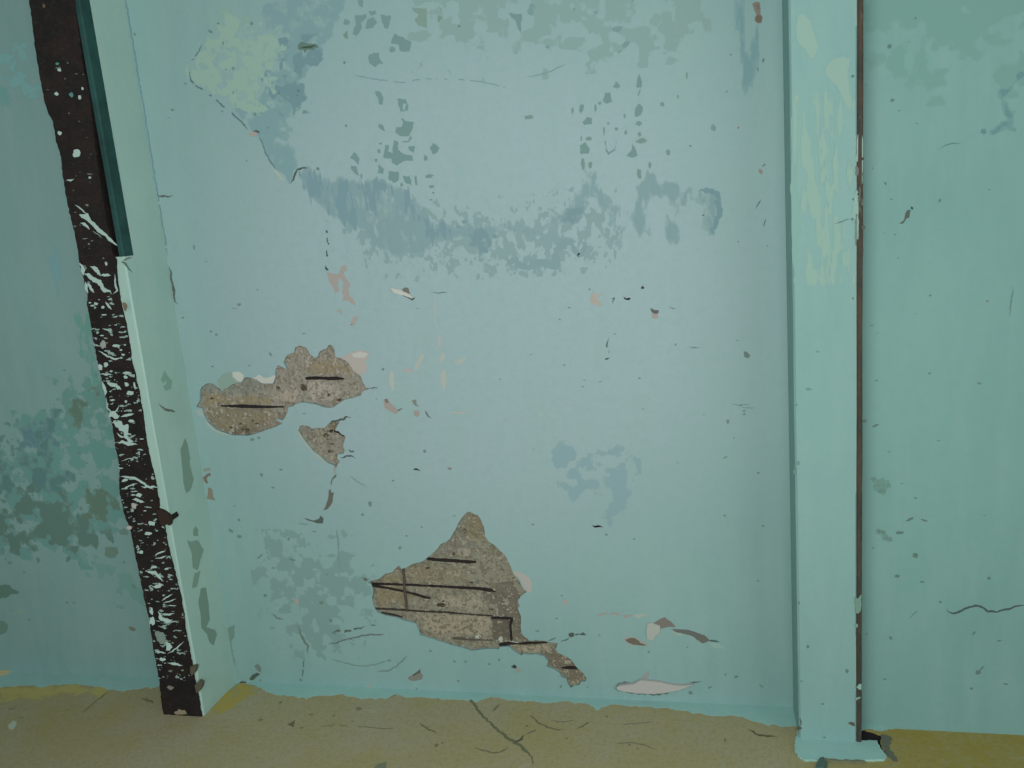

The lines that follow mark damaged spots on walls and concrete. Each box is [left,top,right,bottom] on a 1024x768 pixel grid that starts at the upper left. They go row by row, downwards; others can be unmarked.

leakage [234,0,723,282]
spalling [196,345,370,435]
leakage [0,312,146,609]
spalling [297,422,346,467]
spalling [362,512,586,686]
flaking render [598,612,725,649]
crack [947,605,1024,614]